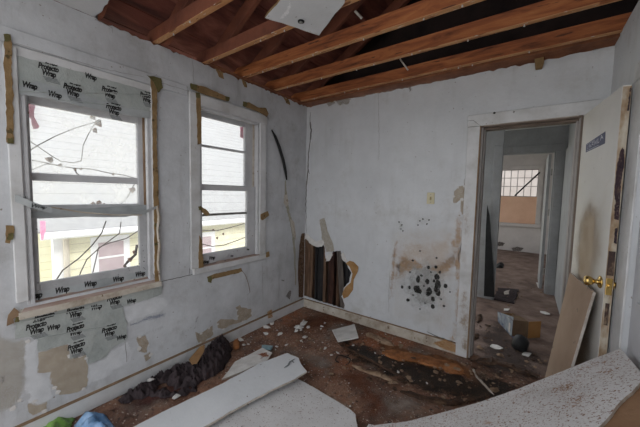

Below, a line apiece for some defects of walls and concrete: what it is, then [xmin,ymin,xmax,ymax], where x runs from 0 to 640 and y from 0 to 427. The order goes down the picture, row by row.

crack [304,113,312,212]
peeling [452,185,465,214]
peeling [298,218,334,298]
peeling [195,305,253,343]
leakage [341,207,550,402]
peeling [22,335,153,415]